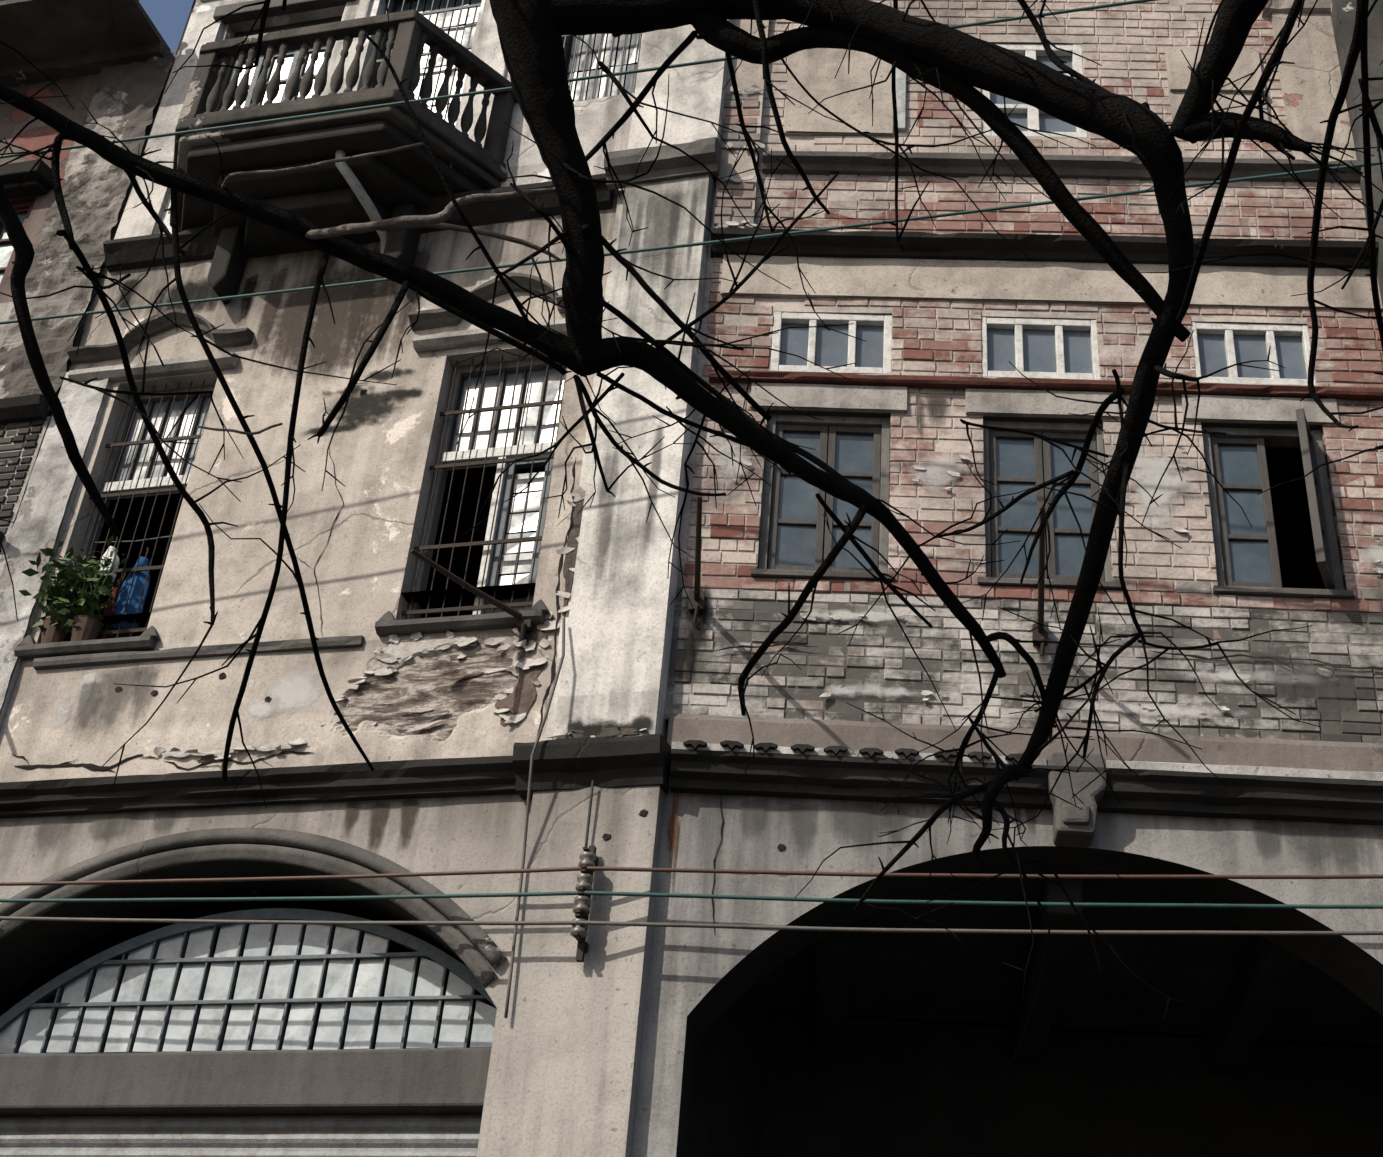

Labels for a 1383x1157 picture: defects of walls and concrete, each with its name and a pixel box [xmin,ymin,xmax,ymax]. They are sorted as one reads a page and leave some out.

spalling [320,487,585,741]
leakage [345,799,418,847]
corrosion [667,795,679,887]
leakage [835,804,903,839]